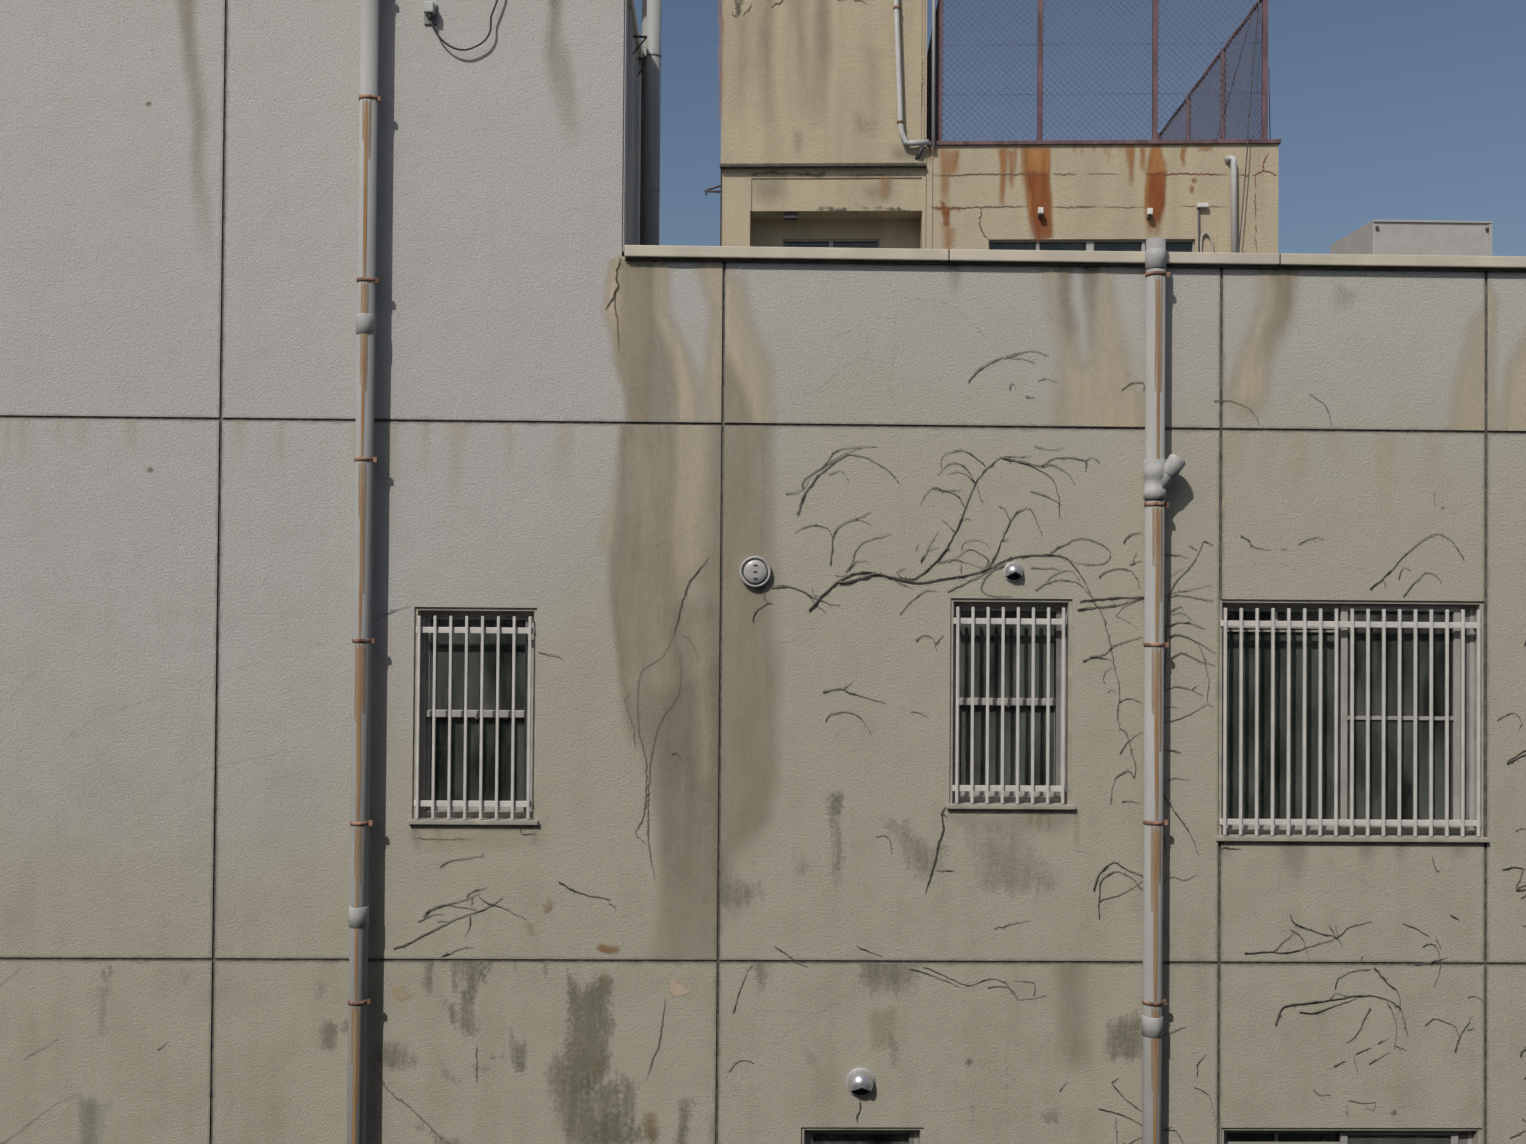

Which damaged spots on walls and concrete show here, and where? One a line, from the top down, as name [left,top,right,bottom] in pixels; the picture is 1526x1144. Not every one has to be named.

rust [1000,147,1051,240]
rust [1126,146,1185,228]
water stain [1230,269,1295,409]
water stain [1454,289,1526,431]
water stain [605,258,771,930]
water stain [555,978,629,1144]